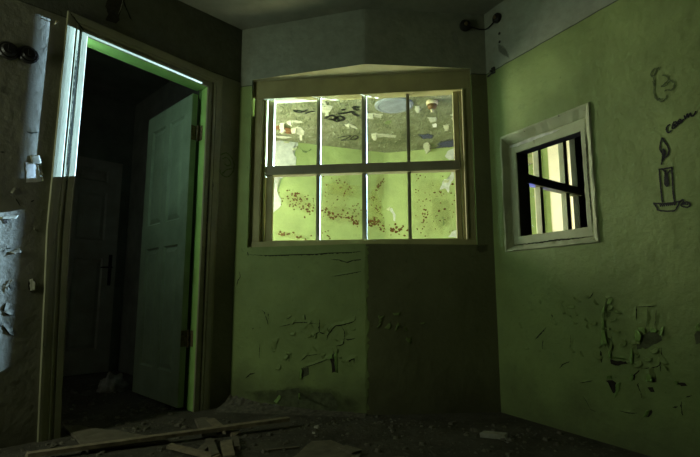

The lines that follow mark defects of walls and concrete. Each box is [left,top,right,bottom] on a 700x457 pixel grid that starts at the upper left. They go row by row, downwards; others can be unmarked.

spalling [600,298,664,366]